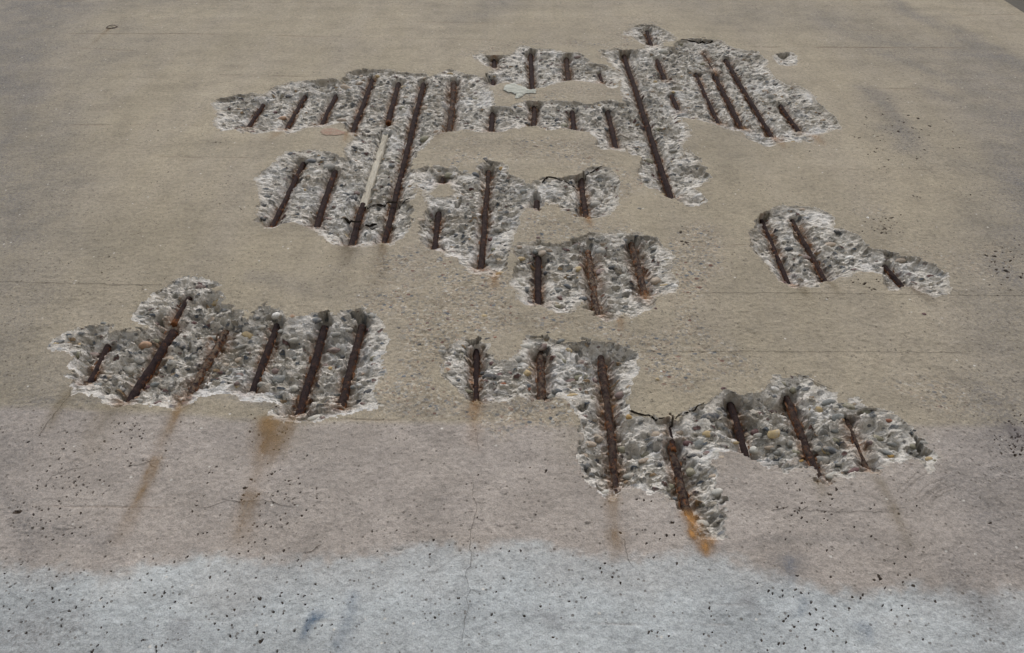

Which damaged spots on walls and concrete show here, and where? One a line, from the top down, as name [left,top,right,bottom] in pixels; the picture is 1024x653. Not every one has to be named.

spalling [210,24,842,322]
spalling [748,205,952,299]
spalling [13,432,109,541]
spalling [47,274,391,467]
crack [629,403,704,427]
spalling [439,331,941,540]